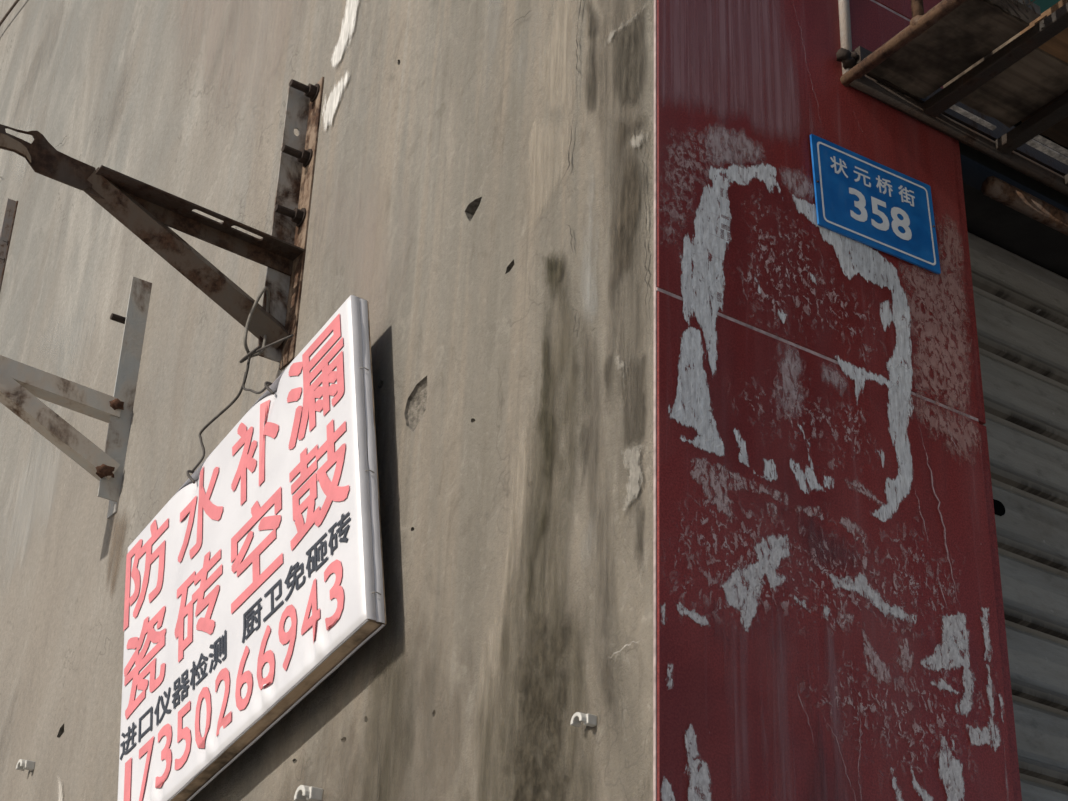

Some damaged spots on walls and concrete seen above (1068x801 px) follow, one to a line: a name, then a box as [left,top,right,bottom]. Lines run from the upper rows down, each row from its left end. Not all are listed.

leakage [586,4,595,108]
peeling [772,170,980,522]
peeling [668,327,824,520]
leakage [478,287,590,801]
peeling [661,602,709,625]
peeling [722,535,790,631]
peeling [840,518,866,547]
peeling [829,573,917,624]
peeling [823,606,1004,801]
peeling [661,779,675,801]
peeling [685,724,711,801]